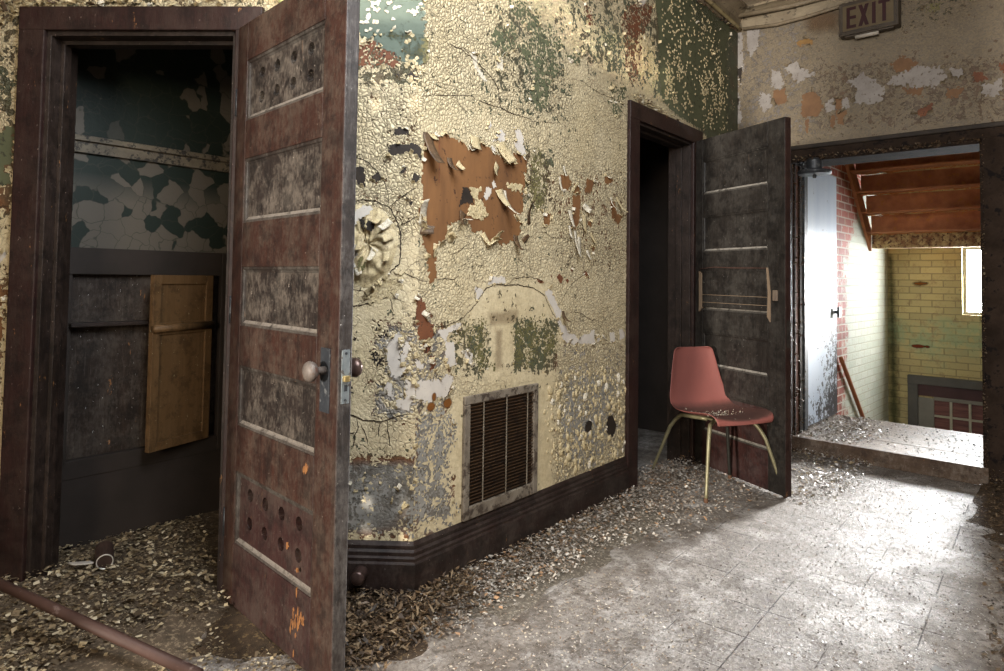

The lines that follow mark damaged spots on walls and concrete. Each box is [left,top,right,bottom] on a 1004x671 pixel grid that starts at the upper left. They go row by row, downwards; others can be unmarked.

peeling [0,0,201,24]
flaking render [471,51,487,82]
peeling [491,0,585,112]
peeling [582,0,761,134]
flaking render [758,55,1004,133]
peeling [0,126,15,186]
peeling [356,166,385,188]
peeling [385,120,628,284]
crack [353,158,622,332]
peeling [0,286,8,341]
peeling [511,268,625,369]
spalling [605,413,618,439]